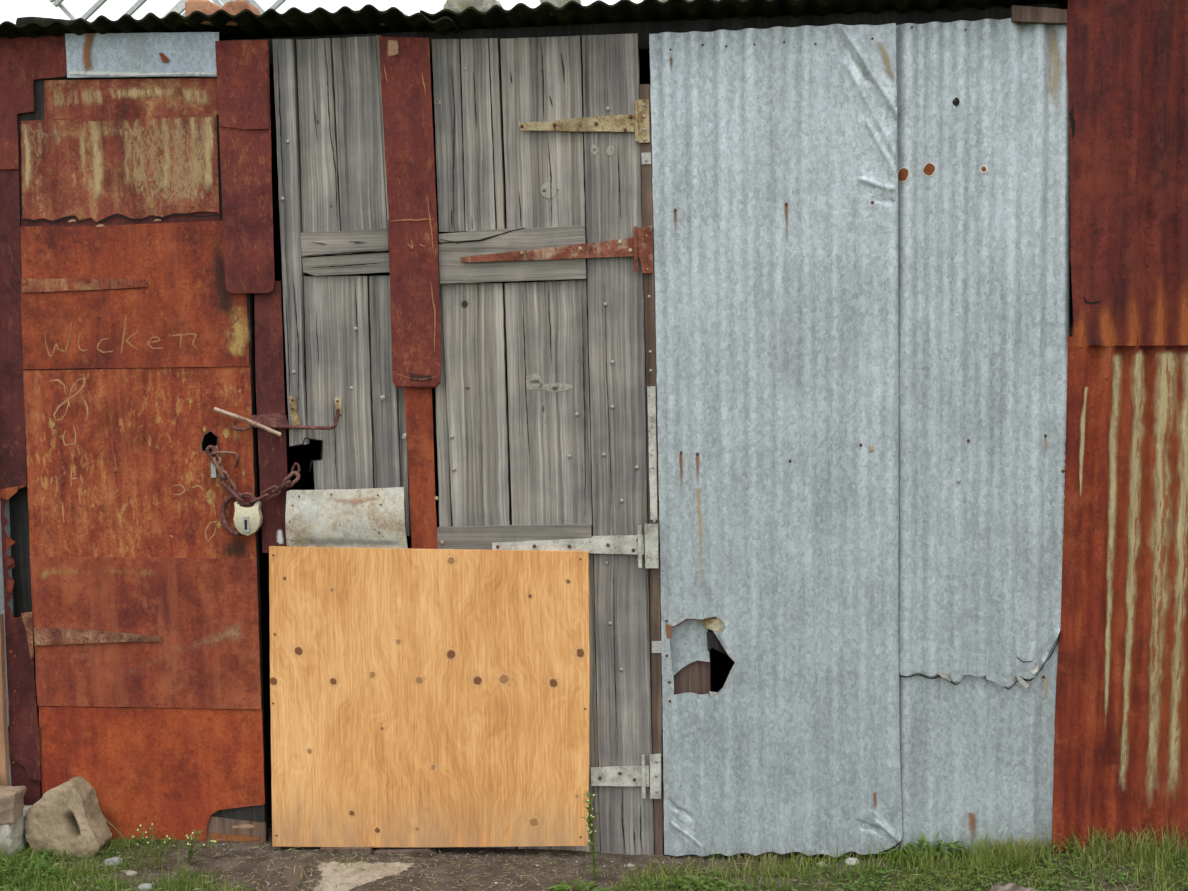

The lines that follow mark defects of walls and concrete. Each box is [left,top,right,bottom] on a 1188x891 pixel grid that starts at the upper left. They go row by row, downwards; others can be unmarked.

rust [384,40,398,83]
rust [898,161,936,183]
rust [394,195,434,252]
rust [0,165,223,727]
rust [1044,0,1188,854]
crack [899,674,965,685]
crack [1005,635,1061,689]
rust [10,758,41,805]